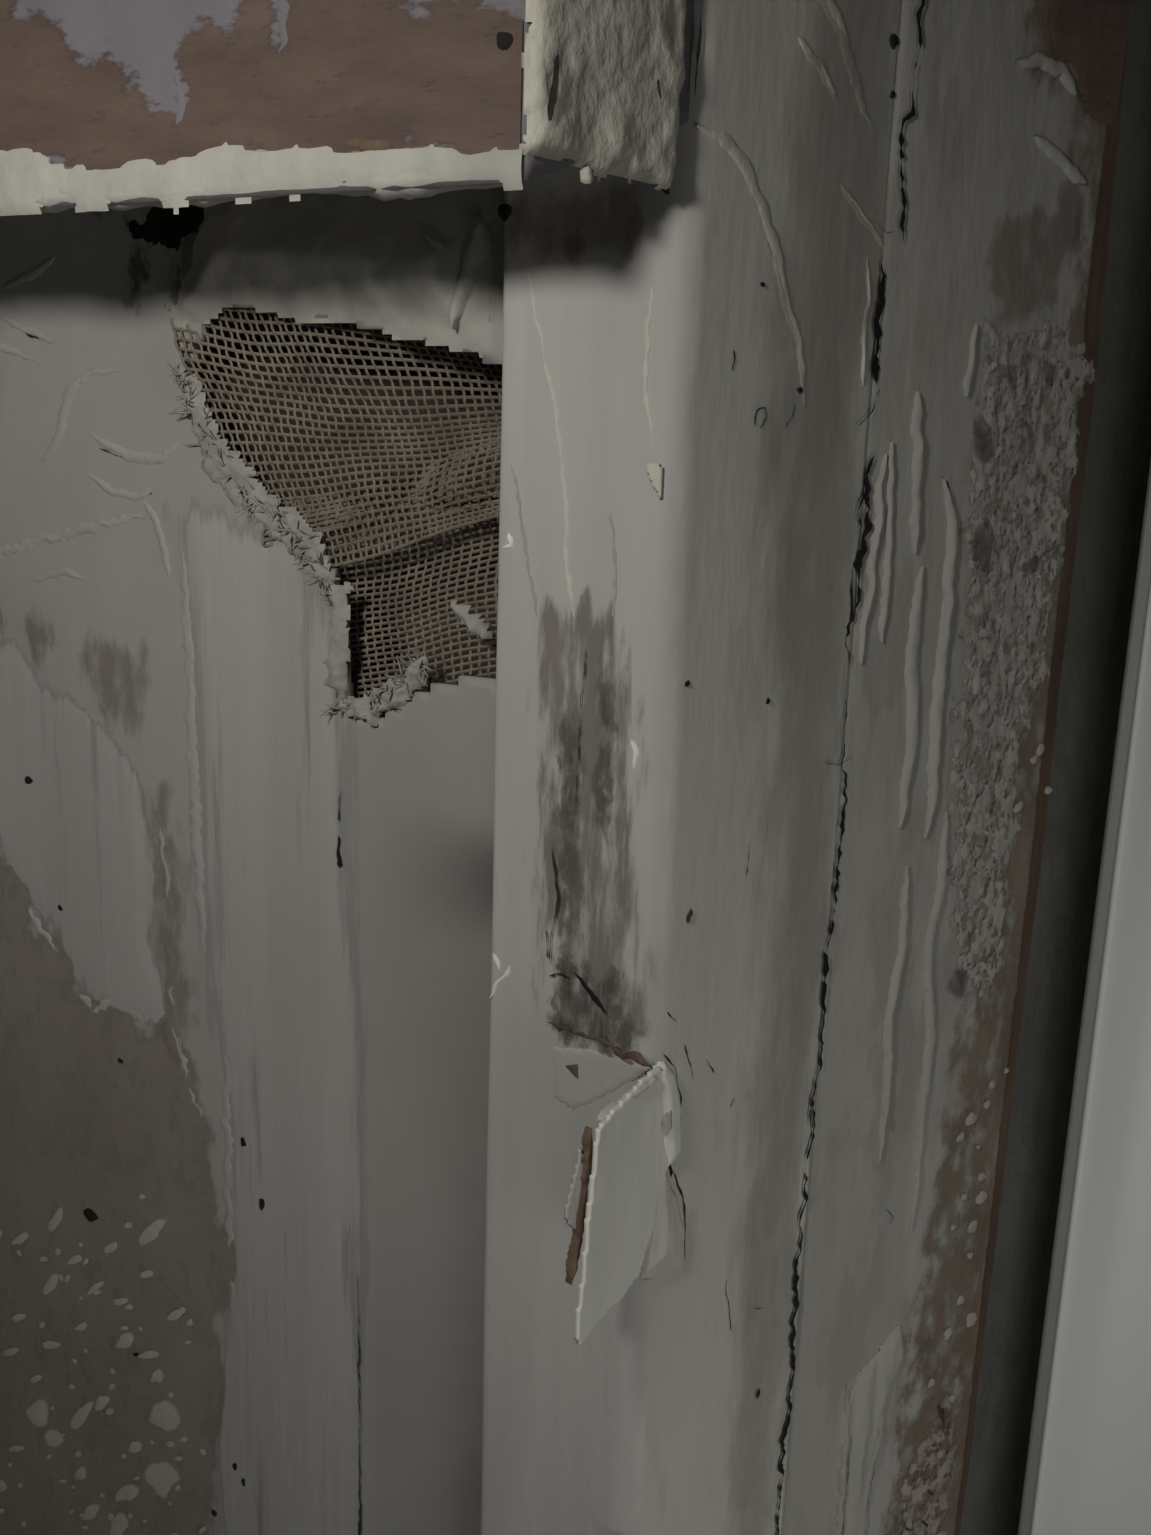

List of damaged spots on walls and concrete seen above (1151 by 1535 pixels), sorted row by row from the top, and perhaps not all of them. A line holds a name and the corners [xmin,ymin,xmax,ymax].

peeling [0,0,523,170]
spalling [547,54,560,121]
spalling [157,282,513,726]
peeling [489,954,511,999]
water stain [541,590,641,1065]
peeling [631,740,639,769]
crack [776,0,925,1535]
peeling [0,859,236,1535]
peeling [564,1045,714,1345]